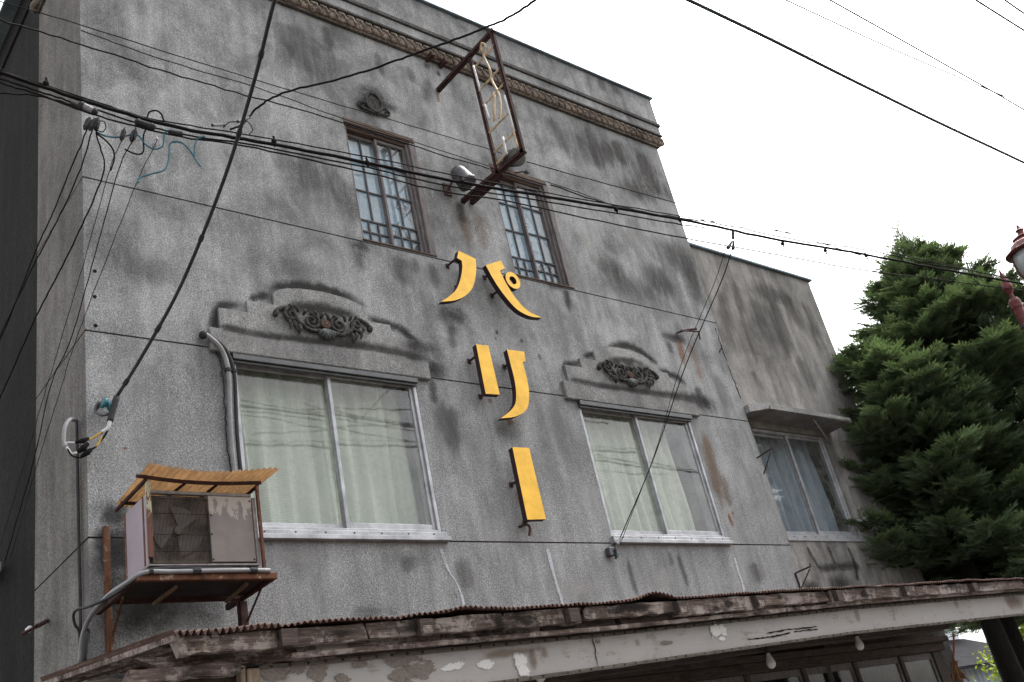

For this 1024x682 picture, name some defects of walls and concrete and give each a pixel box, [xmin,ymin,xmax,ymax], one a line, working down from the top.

rust [703,436,721,499]
peeling [709,621,729,641]
peeling [259,651,494,682]
peeling [510,652,530,676]